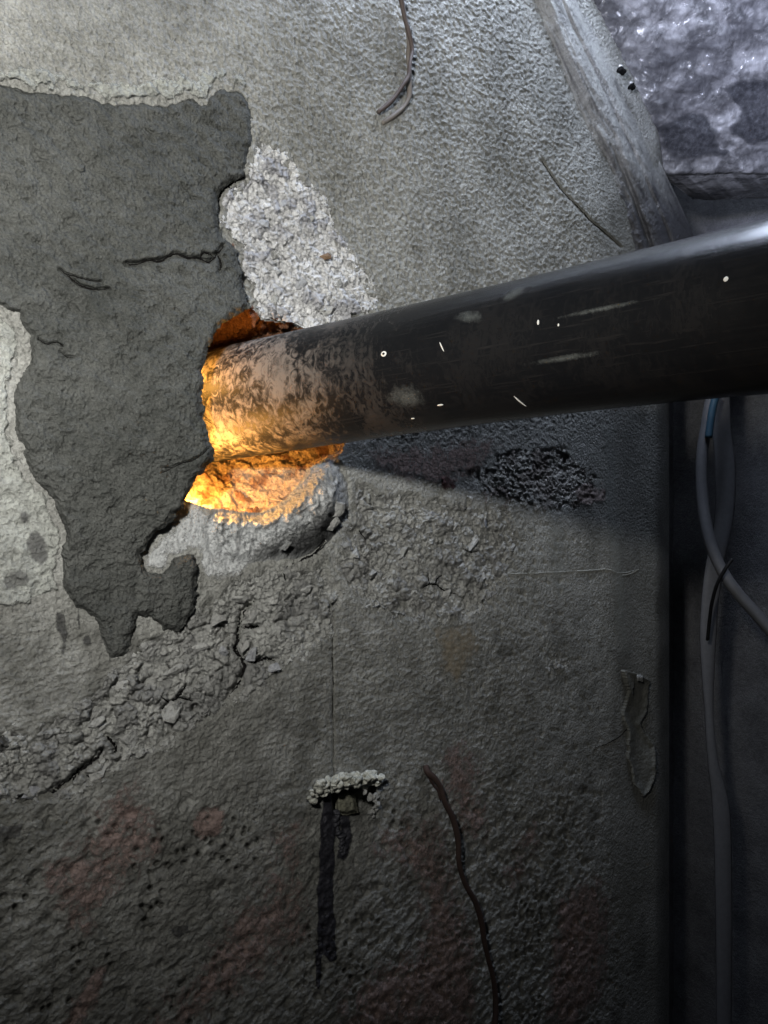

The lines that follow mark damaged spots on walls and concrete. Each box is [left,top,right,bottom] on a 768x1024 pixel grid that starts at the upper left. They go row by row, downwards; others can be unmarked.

crack [61,270,109,290]
crack [127,246,224,271]
spalling [208,142,378,350]
spalling [185,443,344,513]
crack [283,530,366,580]
crack [423,575,455,594]
crack [229,601,274,697]
crack [161,686,193,709]
crack [328,617,336,769]
flaking render [595,670,657,796]
crack [50,736,117,793]
leakage [337,814,351,860]